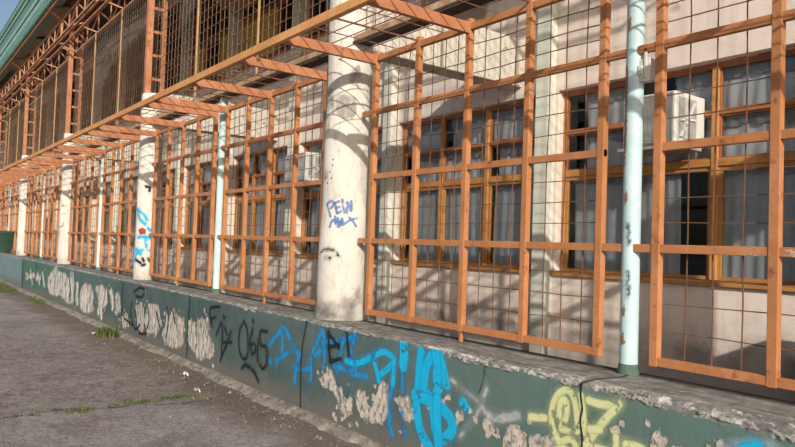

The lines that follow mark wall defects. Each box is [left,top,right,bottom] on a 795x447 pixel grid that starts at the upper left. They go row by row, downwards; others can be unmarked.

peeling [317,367,414,434]
crack [579,375,628,447]
peeling [610,420,625,434]
spalling [605,386,661,408]
peeling [645,419,682,447]
spalling [699,411,758,430]